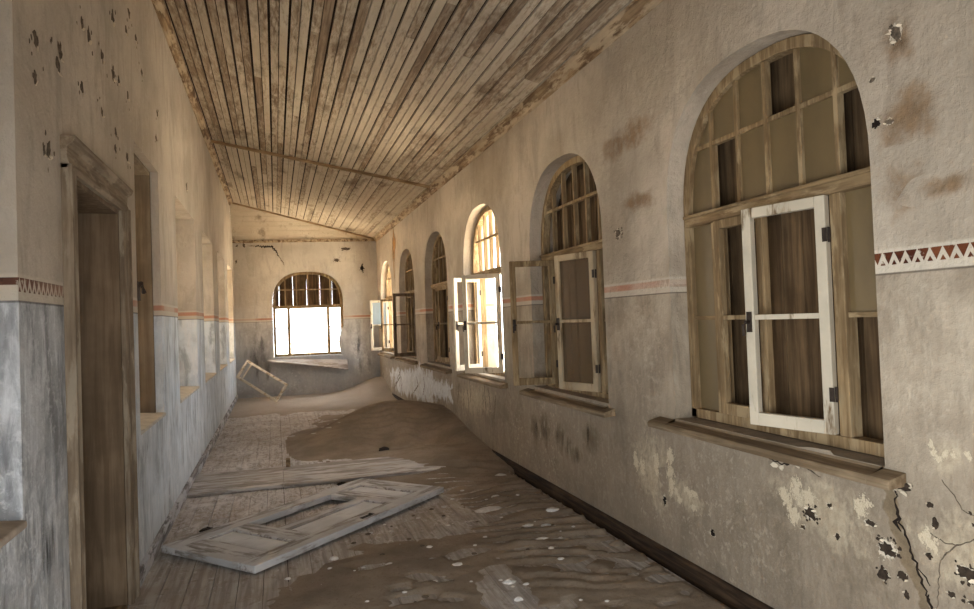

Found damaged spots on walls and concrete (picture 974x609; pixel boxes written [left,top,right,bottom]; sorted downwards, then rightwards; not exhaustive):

spalling [29,30,64,77]
spalling [76,6,131,111]
spalling [885,22,903,46]
spalling [42,130,55,172]
damp [868,0,974,242]
peeling [384,358,460,409]
peeling [746,427,974,609]
crack [879,488,974,609]